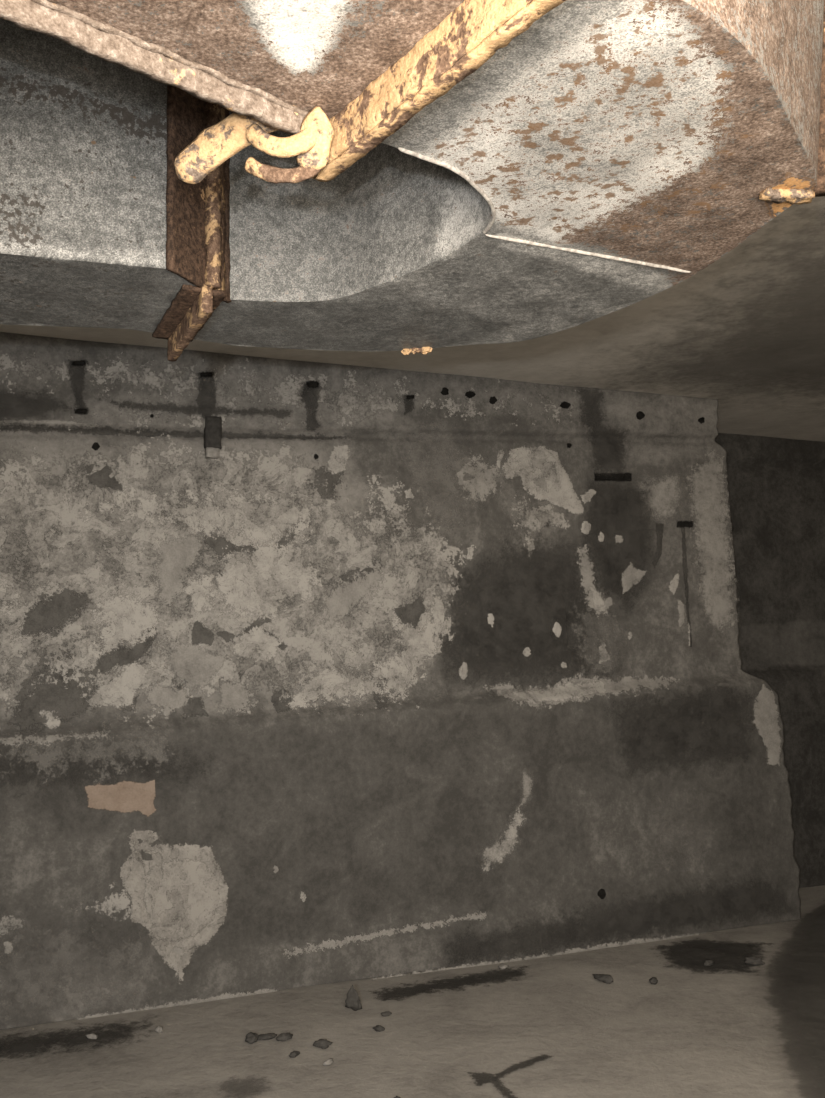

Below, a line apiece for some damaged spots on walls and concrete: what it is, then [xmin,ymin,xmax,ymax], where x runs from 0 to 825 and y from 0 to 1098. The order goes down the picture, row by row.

peeling [0,351,580,985]
spalling [456,445,680,711]
peeling [638,445,739,632]
water stain [375,880,792,1001]
crack [467,1054,552,1098]